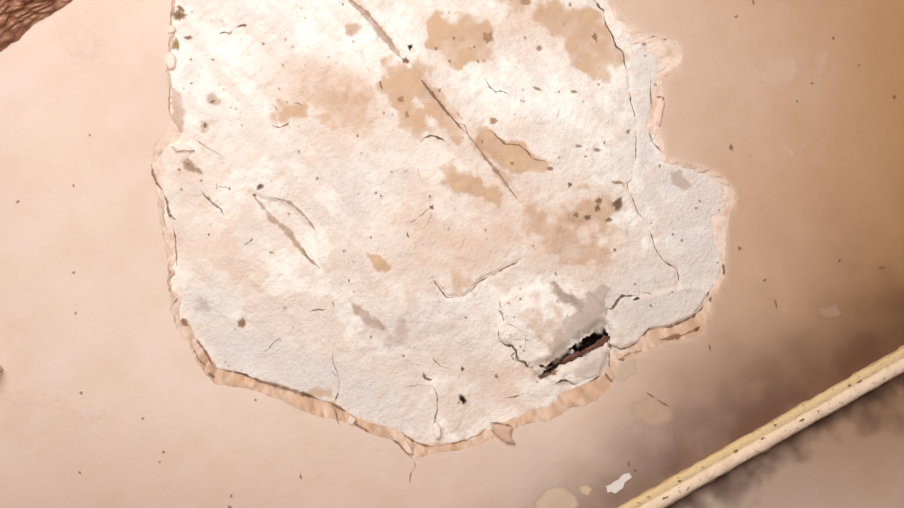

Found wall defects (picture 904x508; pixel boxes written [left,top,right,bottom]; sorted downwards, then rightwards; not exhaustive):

crack [348,0,403,60]
damp [425,11,492,70]
damp [535,0,613,79]
damp [378,58,460,144]
crack [421,80,556,200]
damp [443,172,501,203]
spalling [150,0,739,459]
crack [556,307,702,384]